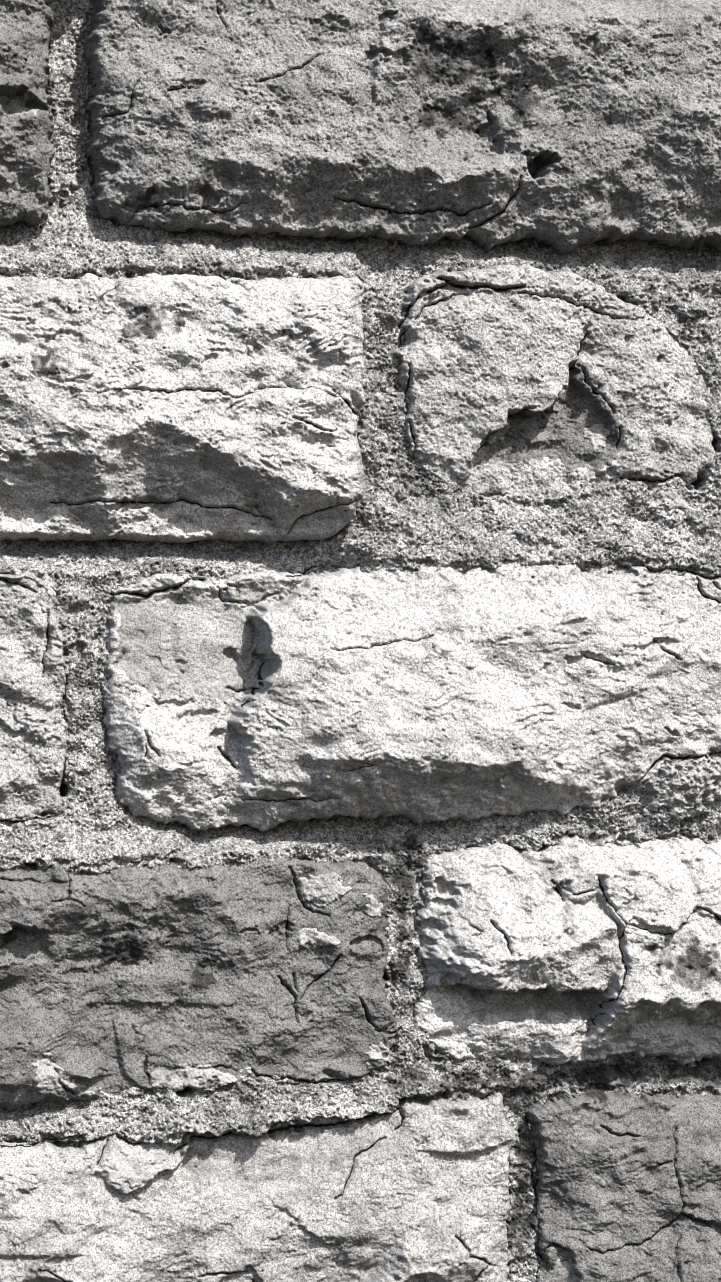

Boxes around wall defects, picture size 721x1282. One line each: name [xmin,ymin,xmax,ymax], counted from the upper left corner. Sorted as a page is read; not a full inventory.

crack [398,278,680,483]
crack [278,867,340,1022]
crack [551,879,721,1032]
crack [456,1128,710,1282]